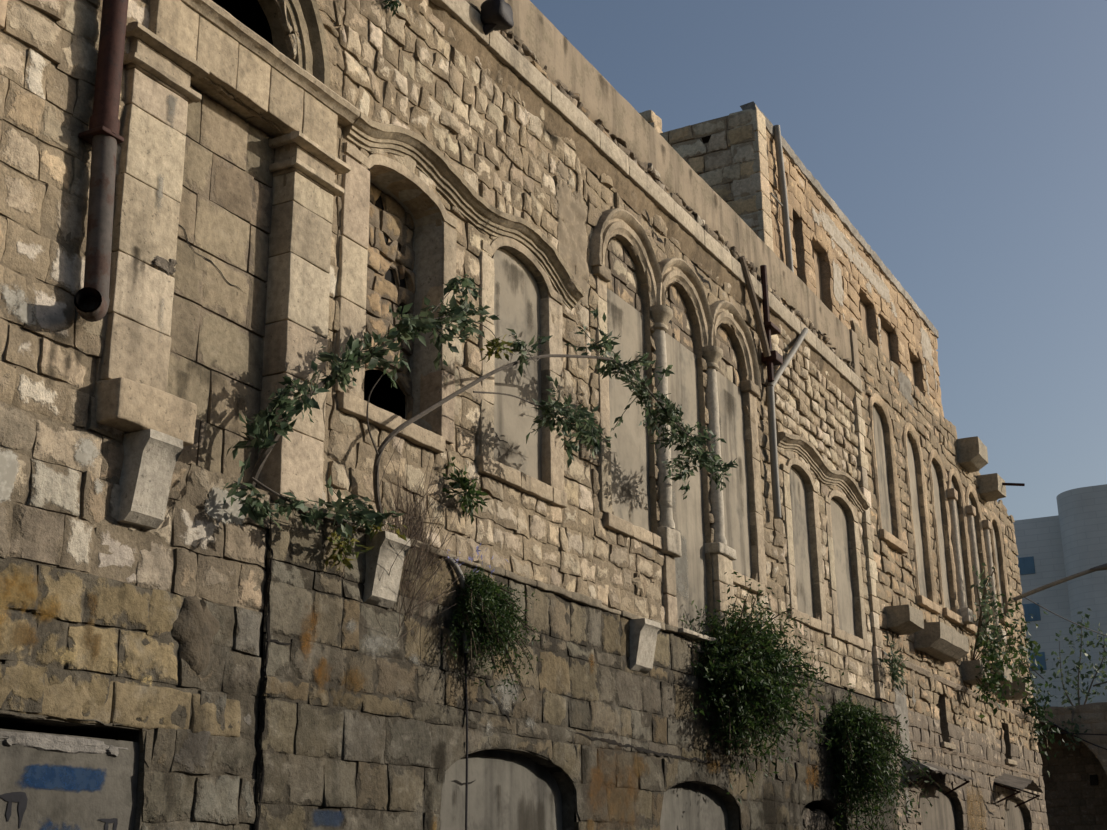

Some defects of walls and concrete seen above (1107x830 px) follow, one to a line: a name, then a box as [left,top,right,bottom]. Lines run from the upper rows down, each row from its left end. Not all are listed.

crack [178,224,246,294]